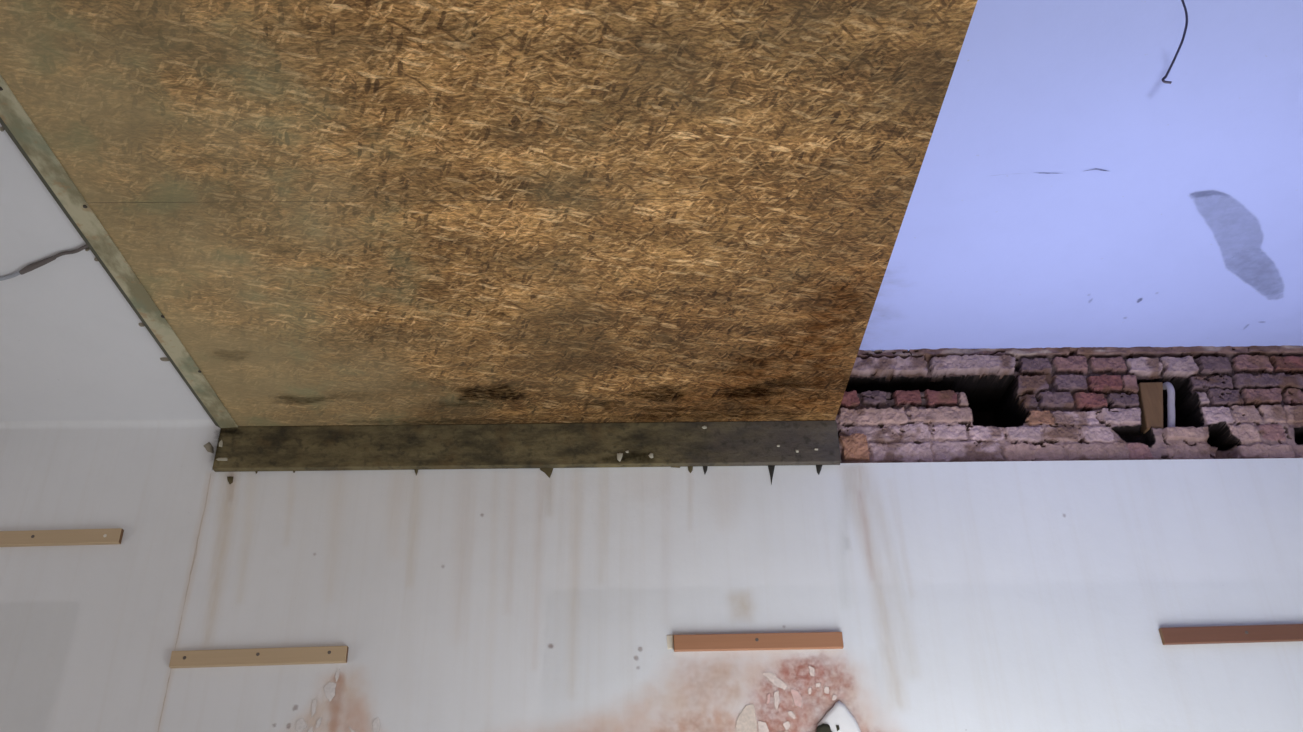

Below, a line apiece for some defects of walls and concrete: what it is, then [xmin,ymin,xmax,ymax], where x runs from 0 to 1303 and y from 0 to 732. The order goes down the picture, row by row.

flaking render [835,345,1303,463]
flaking render [736,666,861,732]